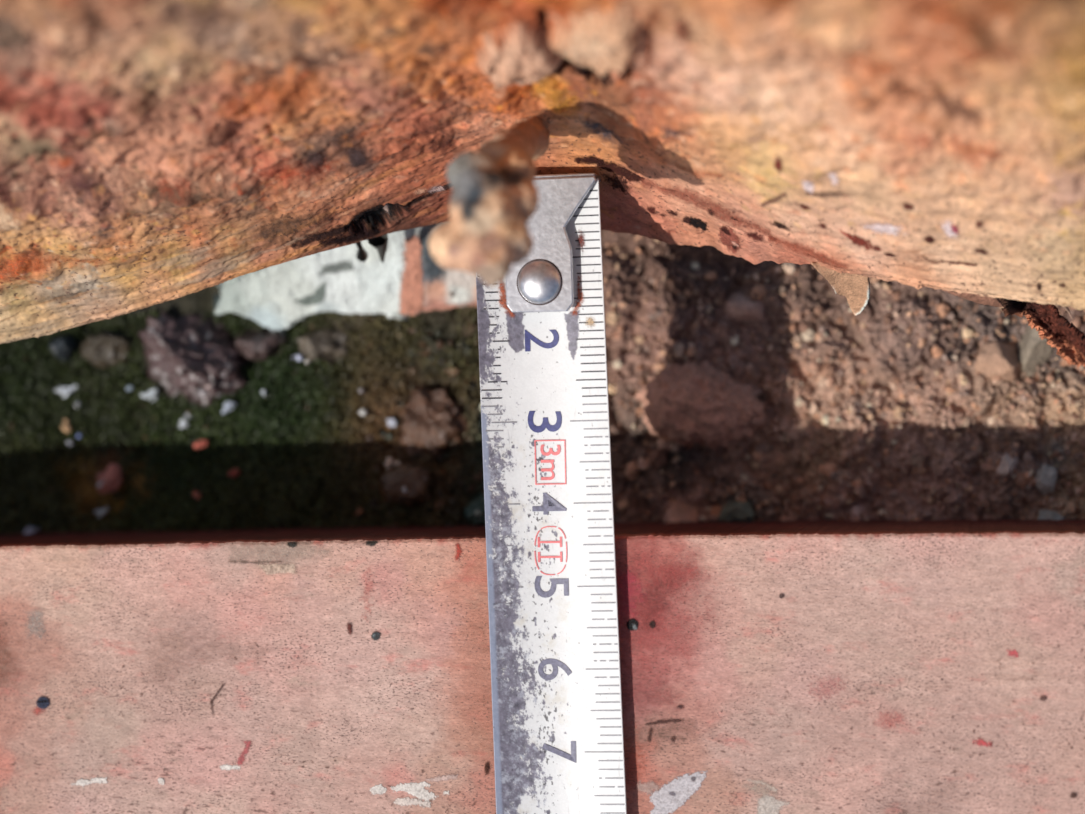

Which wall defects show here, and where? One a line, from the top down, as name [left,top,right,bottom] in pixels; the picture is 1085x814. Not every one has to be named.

crack [291,184,451,249]
rust [499,281,514,317]
rust [573,276,594,326]
rust [998,298,1085,368]